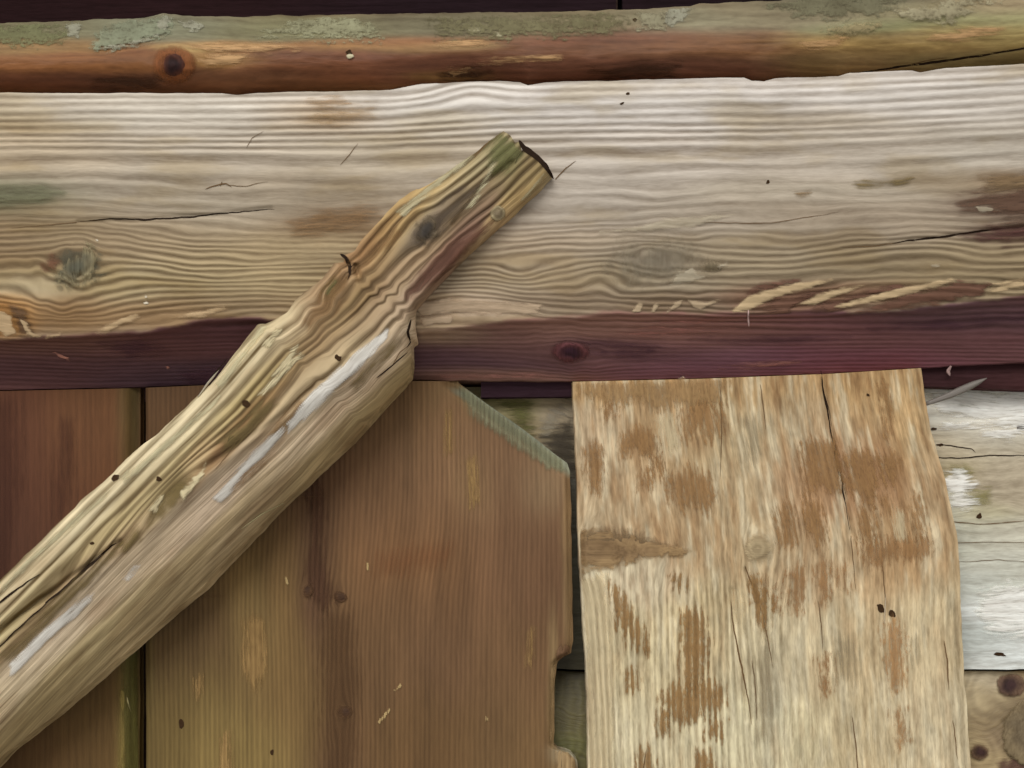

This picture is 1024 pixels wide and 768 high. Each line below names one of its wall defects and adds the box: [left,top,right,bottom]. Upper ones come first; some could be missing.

crack [17,182,267,228]
crack [706,212,835,224]
crack [858,227,1020,247]
crack [821,373,836,447]
crack [838,472,856,588]
crack [0,543,116,646]